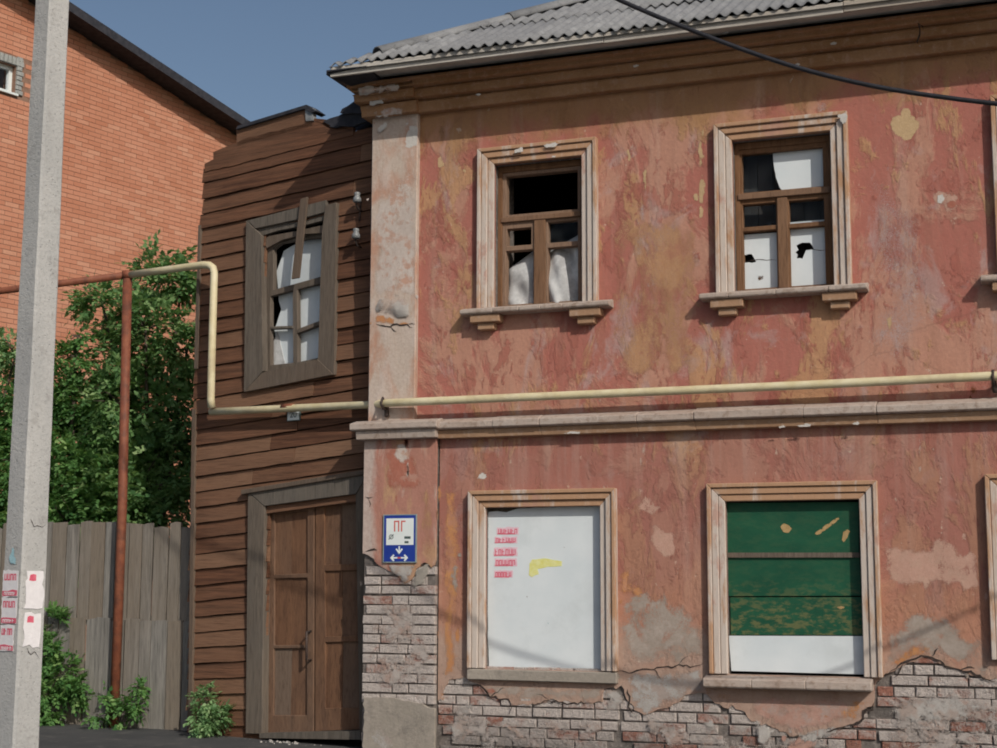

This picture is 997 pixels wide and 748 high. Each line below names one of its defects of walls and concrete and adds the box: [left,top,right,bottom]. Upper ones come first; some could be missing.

peeling [890,108,919,140]
flaking render [360,486,997,748]
crack [618,657,698,713]